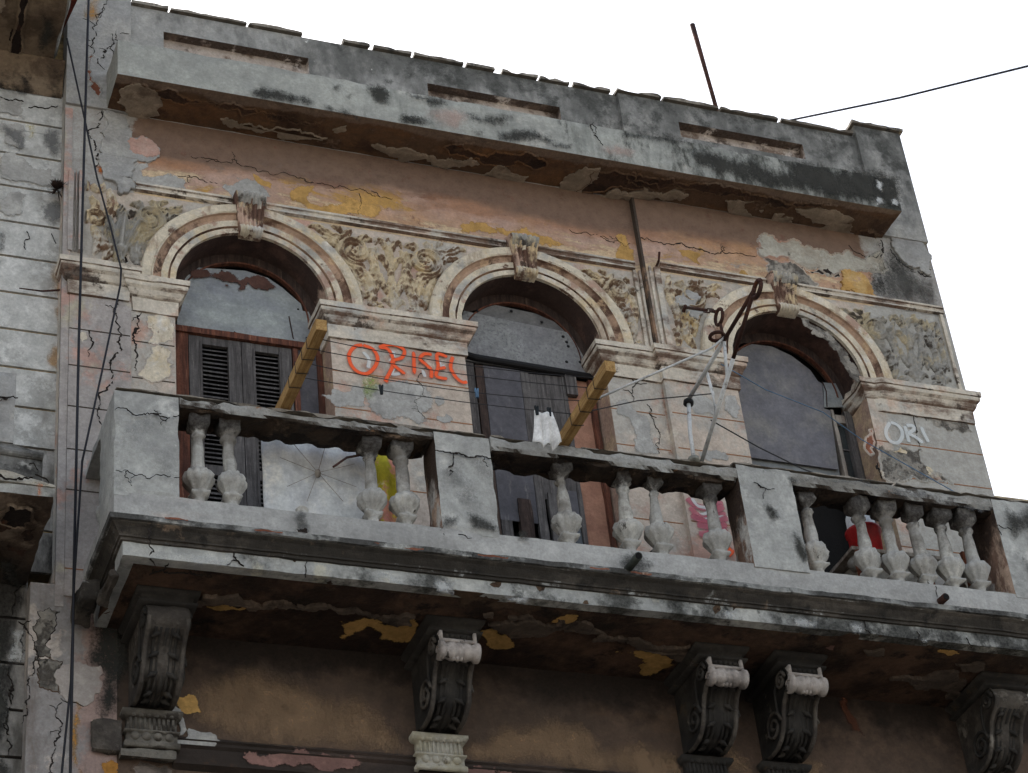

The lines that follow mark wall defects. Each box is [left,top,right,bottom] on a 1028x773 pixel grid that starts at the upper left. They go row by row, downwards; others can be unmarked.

crack [83,0,128,70]
peeling [84,54,185,189]
water stain [253,87,312,105]
water stain [369,84,389,103]
water stain [473,115,570,148]
water stain [627,132,901,208]
crack [569,229,757,257]
flaking render [558,166,889,296]
crack [88,300,181,425]
crack [3,586,84,773]
spalling [100,694,220,773]
peeling [243,747,361,772]